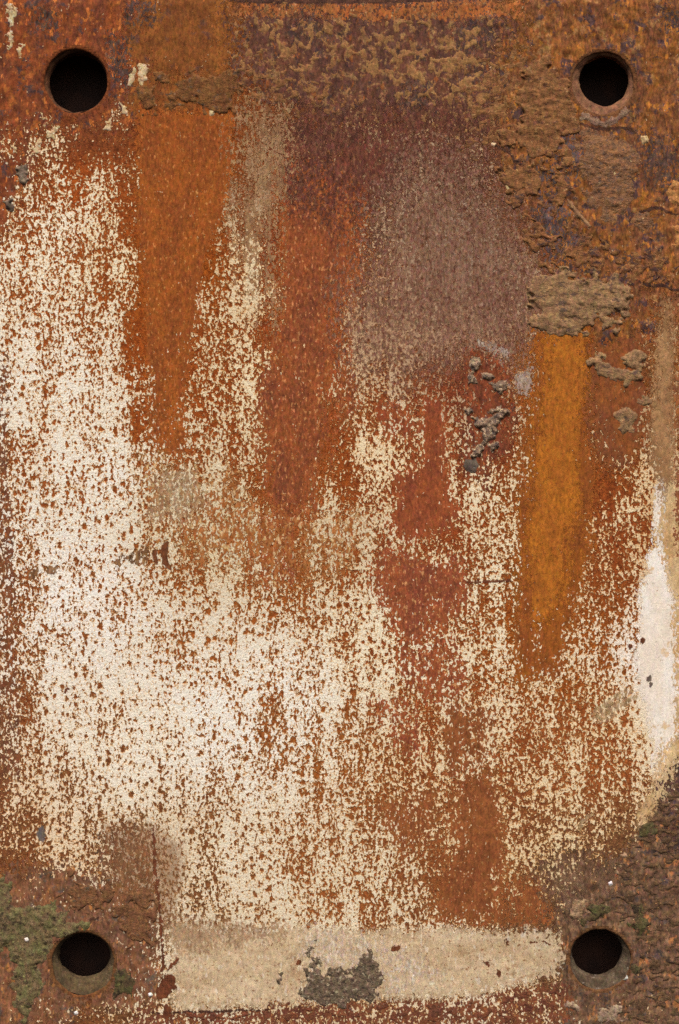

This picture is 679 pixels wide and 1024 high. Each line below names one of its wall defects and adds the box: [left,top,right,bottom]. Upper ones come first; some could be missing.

peeling [31,112,60,156]
corrosion [0,0,679,693]
spalling [152,541,172,570]
corrosion [0,350,679,1024]
peeling [55,869,159,961]
peeling [184,922,580,1024]